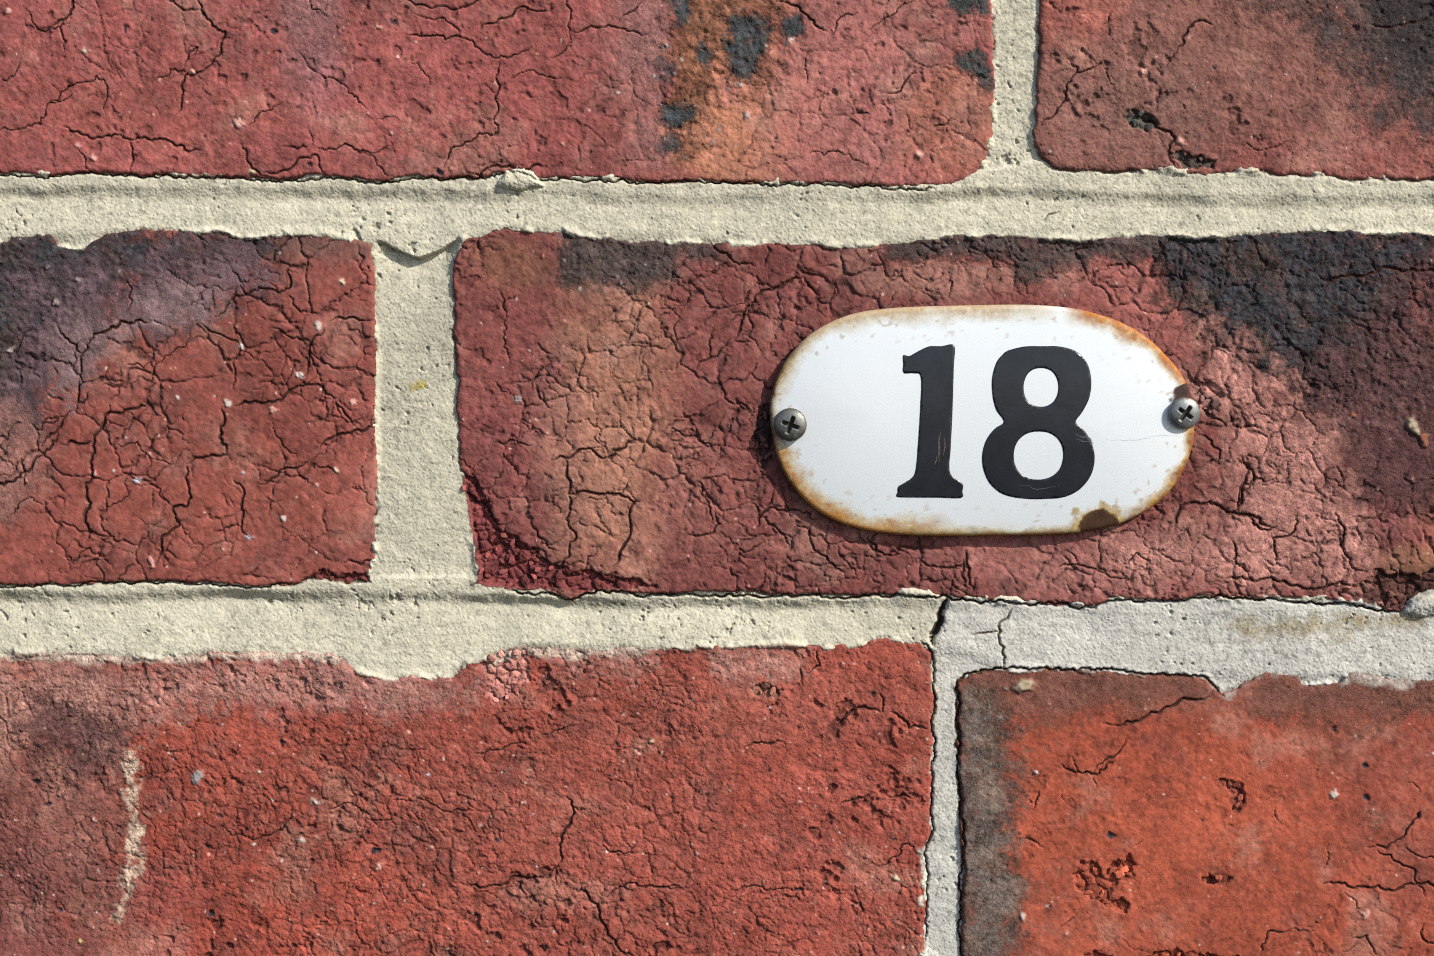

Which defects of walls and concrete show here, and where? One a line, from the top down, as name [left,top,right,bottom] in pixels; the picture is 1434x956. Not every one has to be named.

crack [0,0,932,191]
crack [854,72,950,130]
crack [1320,261,1434,291]
crack [0,265,375,589]
crack [462,239,1399,956]
crack [219,820,289,841]
crack [328,798,471,821]
spalling [1073,854,1135,913]
crack [1325,782,1434,956]